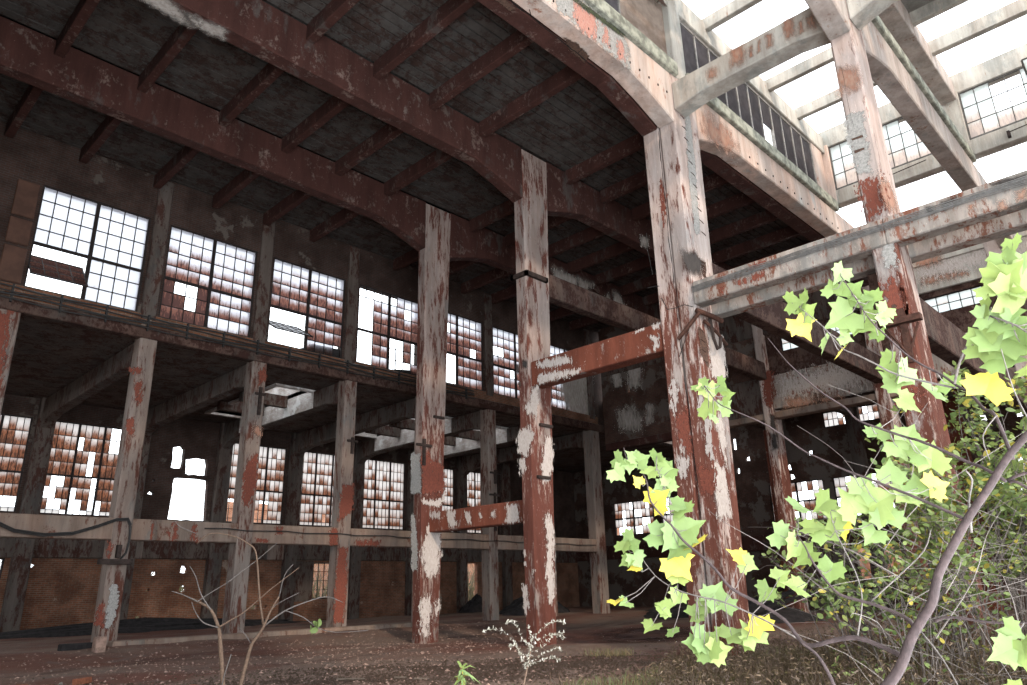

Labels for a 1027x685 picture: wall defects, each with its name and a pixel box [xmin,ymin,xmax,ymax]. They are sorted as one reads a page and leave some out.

peeling [659,179,669,228]
spalling [680,115,706,236]
corrosion [853,170,897,222]
corrosion [719,260,766,296]
corrosion [921,271,969,285]
peeling [698,327,874,409]
peeling [516,354,581,484]
peeling [598,322,733,521]
peeling [521,513,556,617]